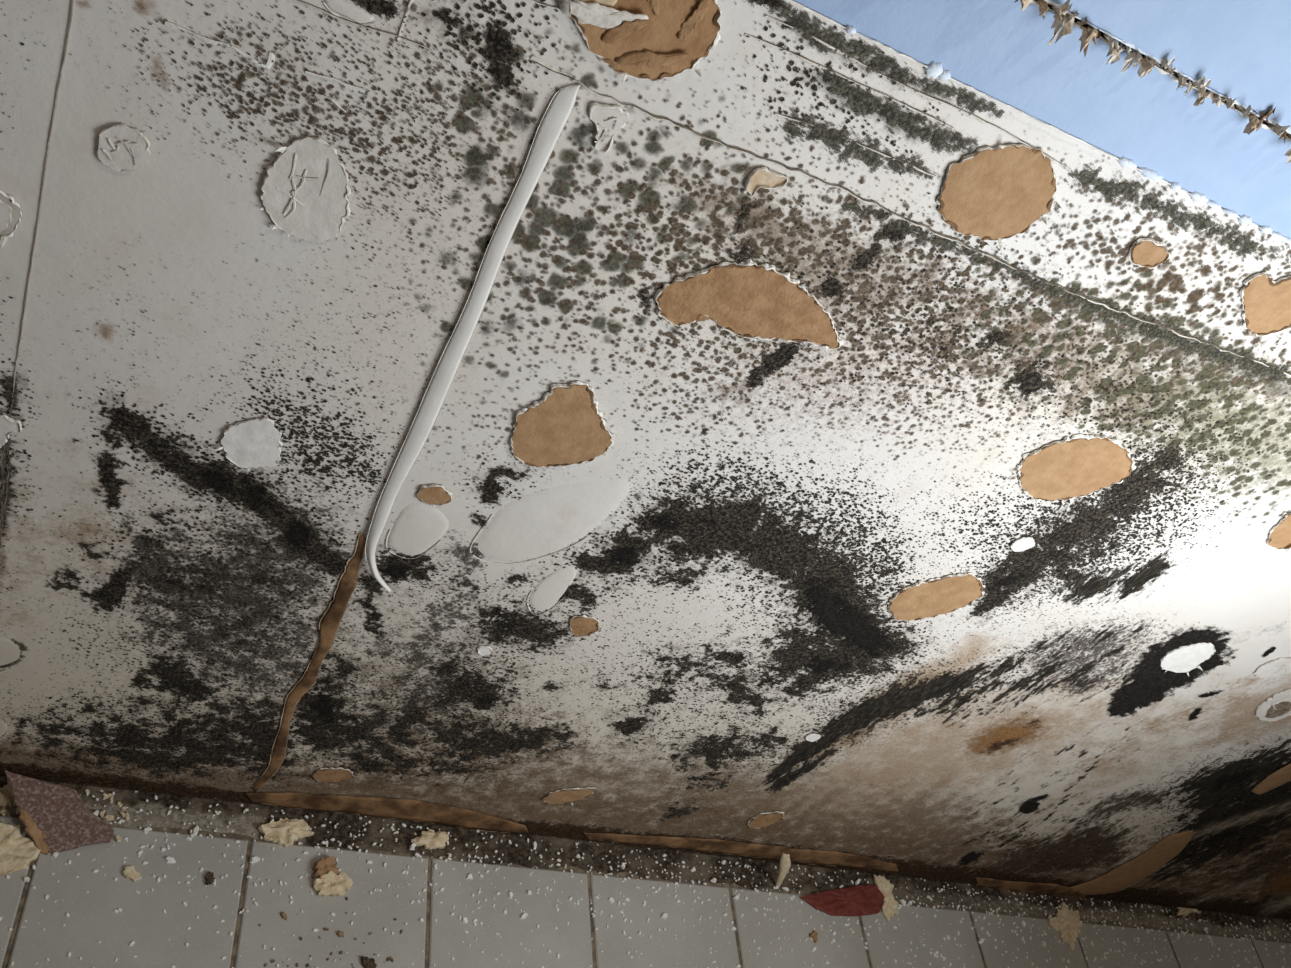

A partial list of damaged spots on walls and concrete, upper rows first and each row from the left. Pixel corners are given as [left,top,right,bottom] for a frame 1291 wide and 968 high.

peeling [558,0,722,85]
leakage [639,117,693,154]
leakage [700,90,736,157]
peeling [936,144,1061,249]
leakage [73,257,154,360]
peeling [1239,272,1291,338]
leakage [0,354,41,610]
leakage [433,403,545,529]
peeling [510,381,615,471]
peeling [1013,434,1136,504]
peeling [887,573,985,624]
peeling [1160,643,1216,676]